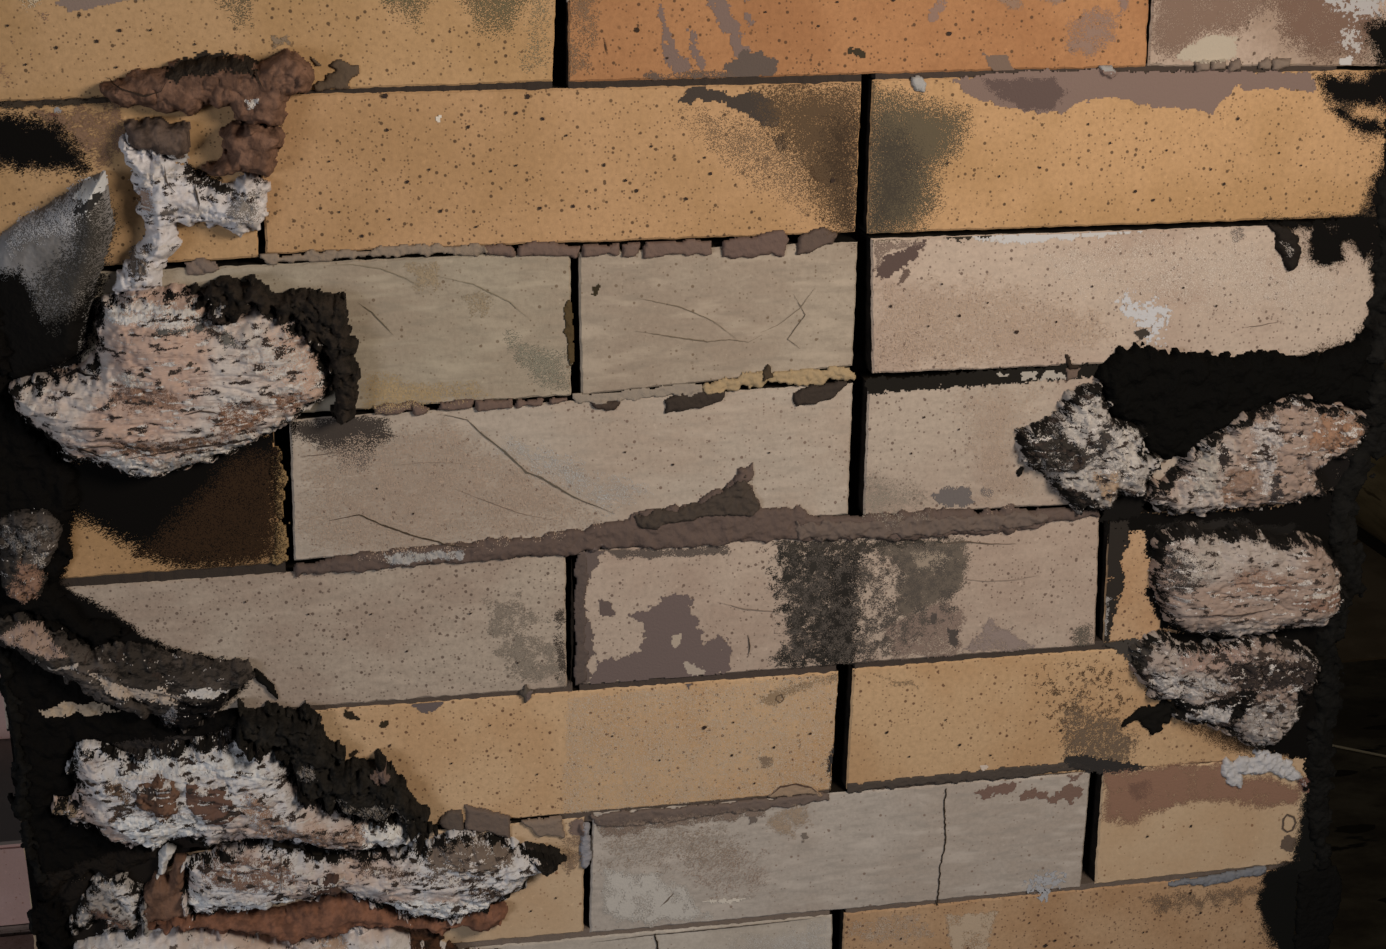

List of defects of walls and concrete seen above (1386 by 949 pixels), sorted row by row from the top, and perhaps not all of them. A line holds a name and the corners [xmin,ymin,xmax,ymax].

efflorescence [1322,0,1385,65]
spalling [671,633,706,690]
damp [1147,667,1307,788]
crack [936,788,947,905]
crack [592,893,824,949]